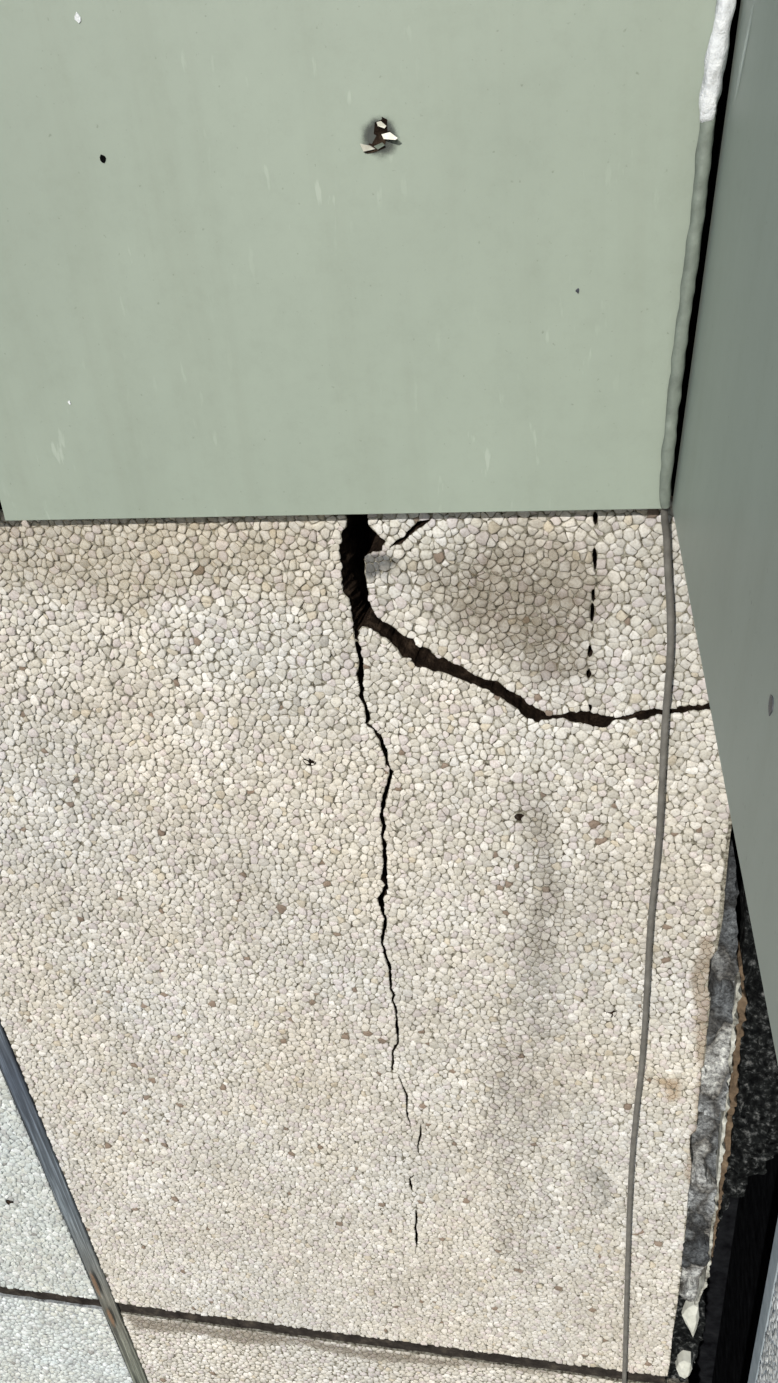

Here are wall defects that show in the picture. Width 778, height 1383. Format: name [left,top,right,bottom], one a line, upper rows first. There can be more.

crack [339,512,710,1245]
spalling [665,835,778,1383]